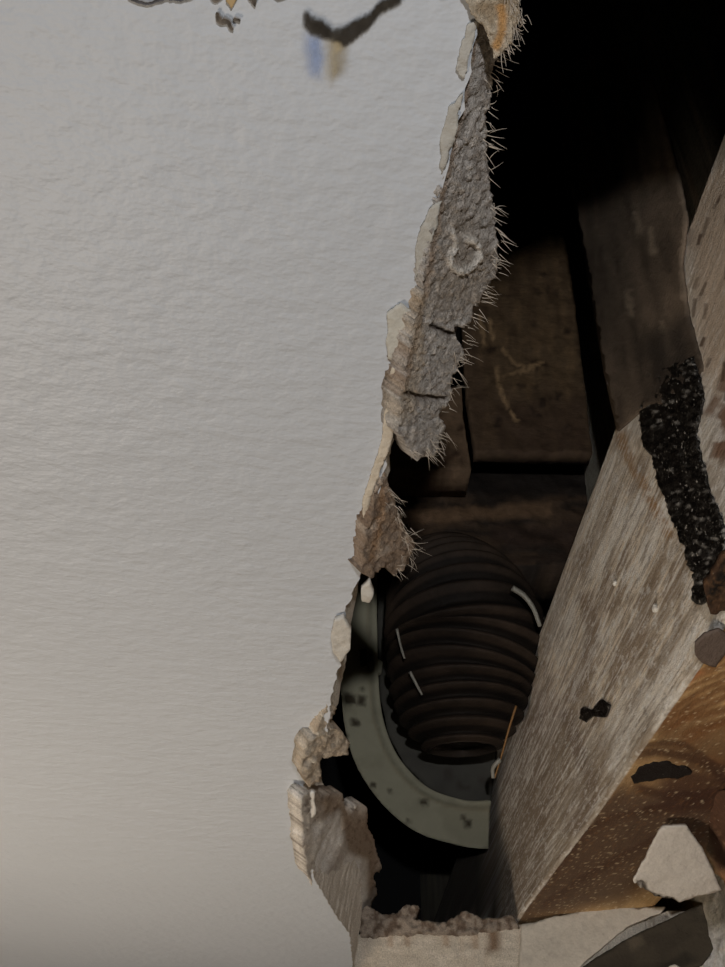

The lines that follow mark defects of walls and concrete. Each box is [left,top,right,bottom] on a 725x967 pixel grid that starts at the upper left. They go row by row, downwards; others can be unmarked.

crack [131,0,184,8]
crack [212,0,257,31]
crack [304,0,401,46]
flaking render [348,20,519,603]
peeling [331,614,351,662]
flaking render [287,702,521,967]